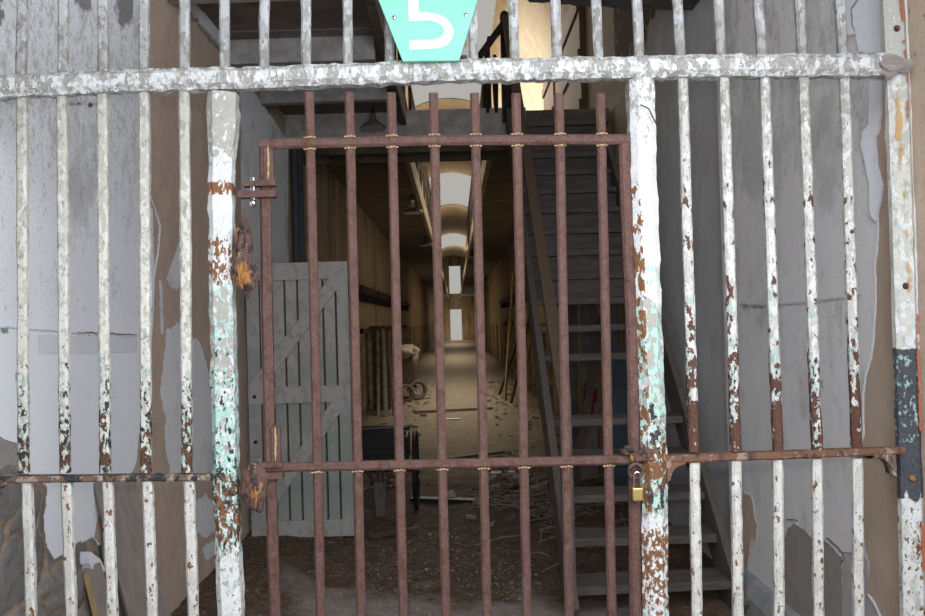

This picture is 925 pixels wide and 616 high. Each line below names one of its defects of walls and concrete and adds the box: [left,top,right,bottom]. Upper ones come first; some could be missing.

flaking render [165,5,179,69]
flaking render [190,4,220,68]
flaking render [0,434,28,616]
flaking render [33,483,65,616]
flaking render [75,513,105,616]
flaking render [131,433,143,508]
flaking render [150,93,216,610]
flaking render [235,285,252,540]